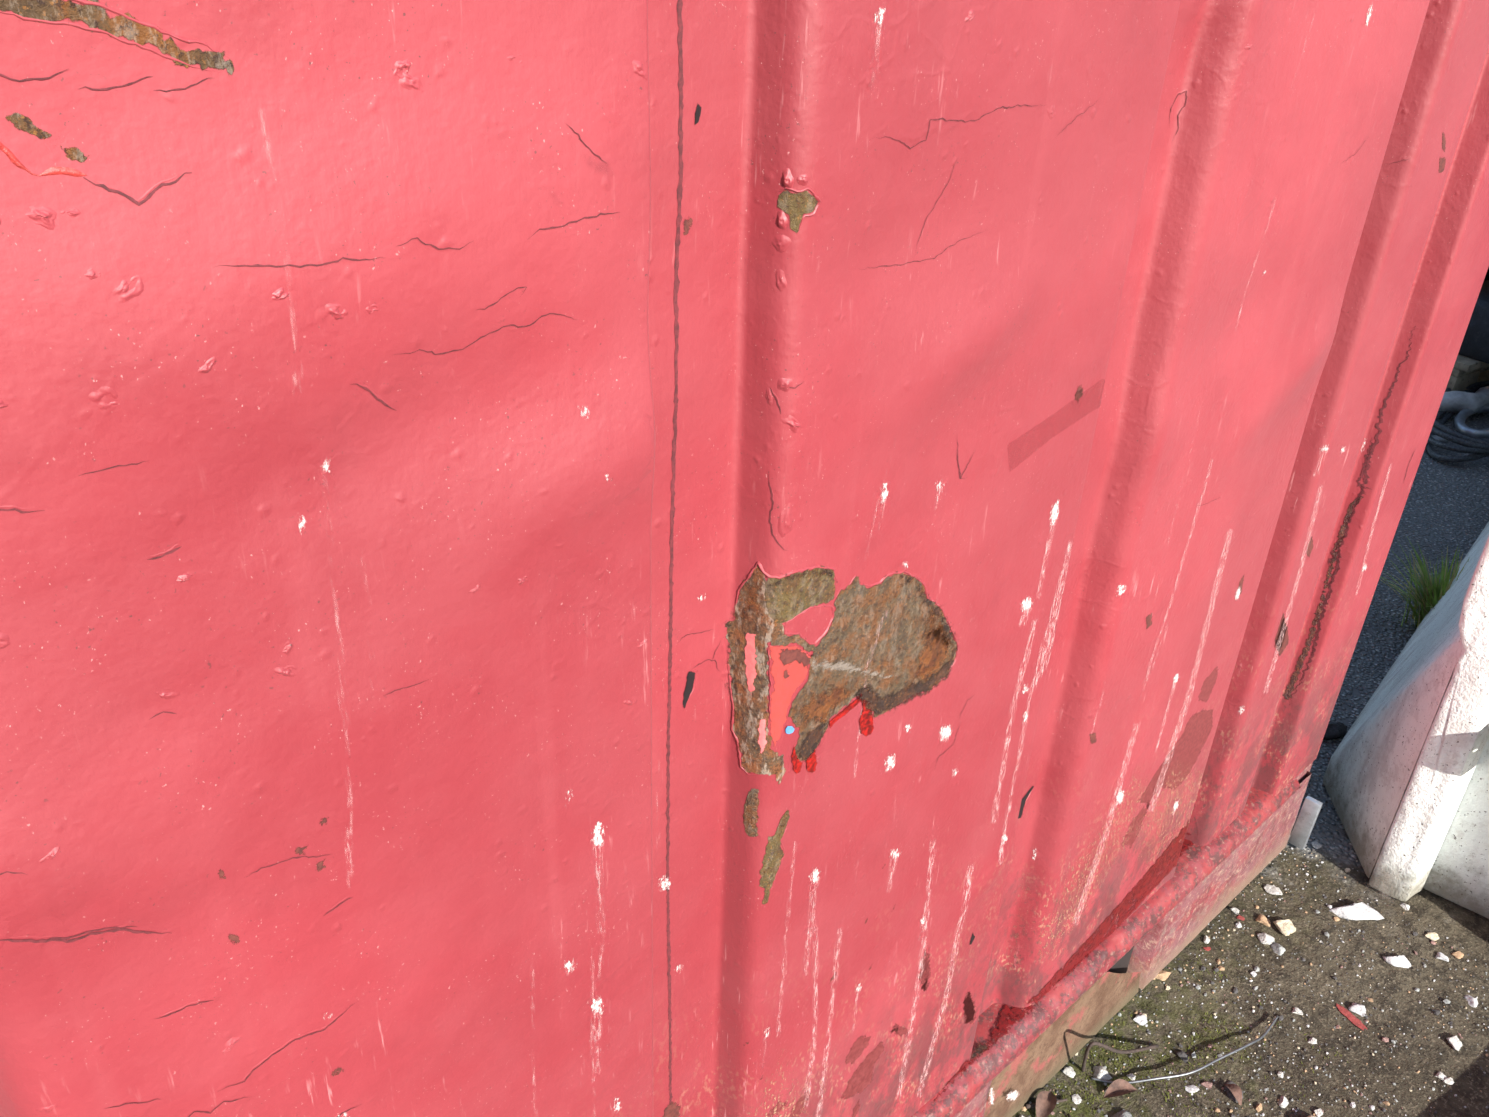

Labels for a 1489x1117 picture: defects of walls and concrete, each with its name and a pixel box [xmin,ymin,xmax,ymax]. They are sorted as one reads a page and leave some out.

crack [0,69,207,92]
crack [882,101,1097,149]
crack [85,172,192,205]
crack [215,237,470,268]
peeling [772,168,821,292]
crack [861,167,976,270]
crack [394,287,578,355]
corrosion [725,561,959,906]
crack [0,926,169,943]
crack [106,1003,355,1117]